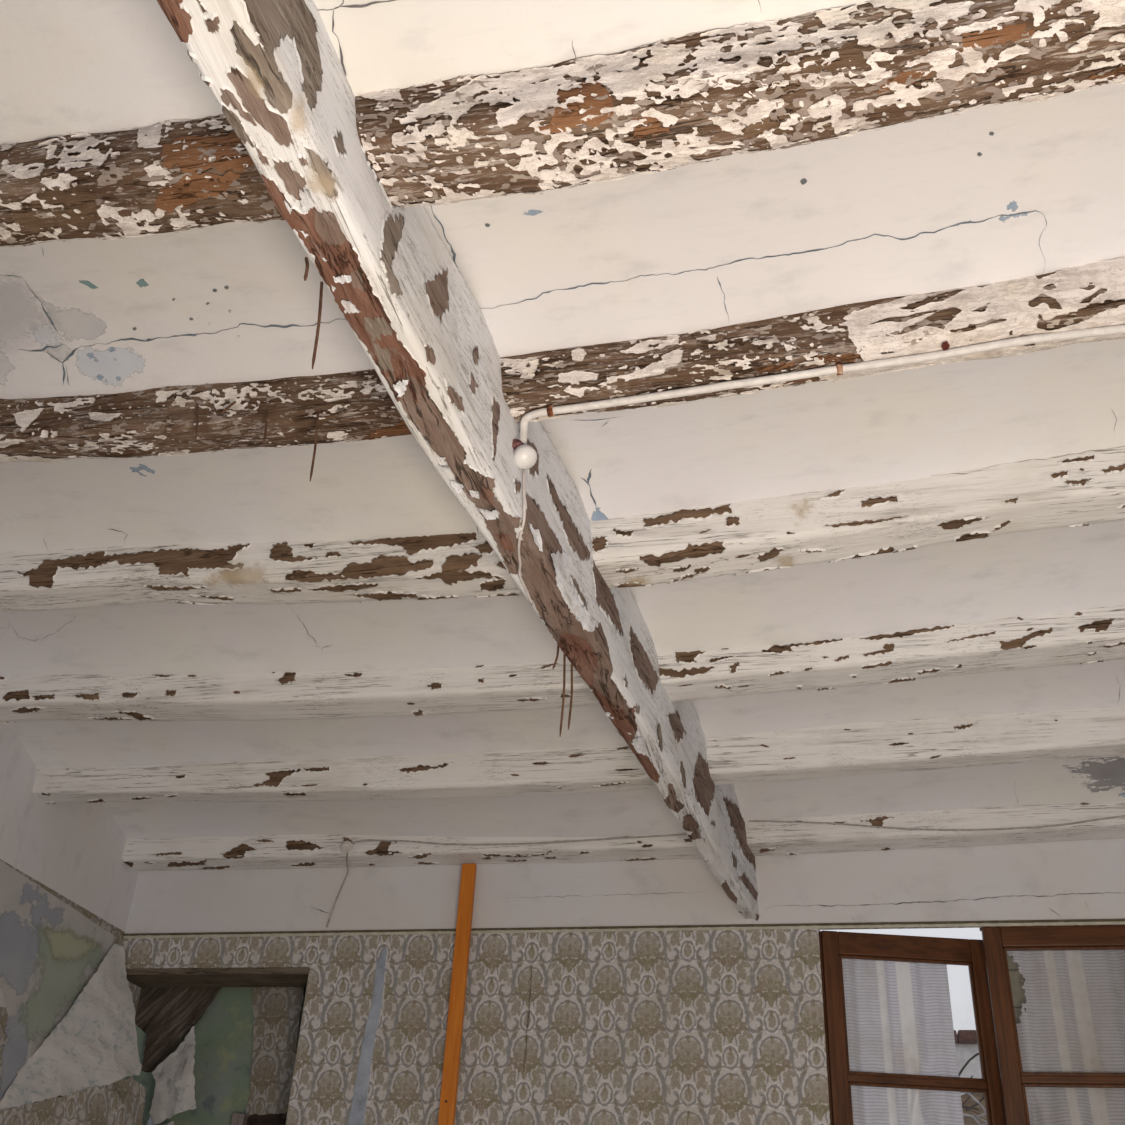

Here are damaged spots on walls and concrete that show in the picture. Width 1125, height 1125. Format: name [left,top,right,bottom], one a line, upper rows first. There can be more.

peeling [355,0,1125,299]
crack [489,210,1047,318]
crack [3,275,346,385]
peeling [490,256,1125,466]
peeling [0,0,804,903]
peeling [1049,454,1125,488]
peeling [732,545,919,576]
peeling [823,495,910,529]
peeling [937,516,1013,542]
peeling [760,617,1054,684]
peeling [1073,611,1125,665]
peeling [830,815,897,829]